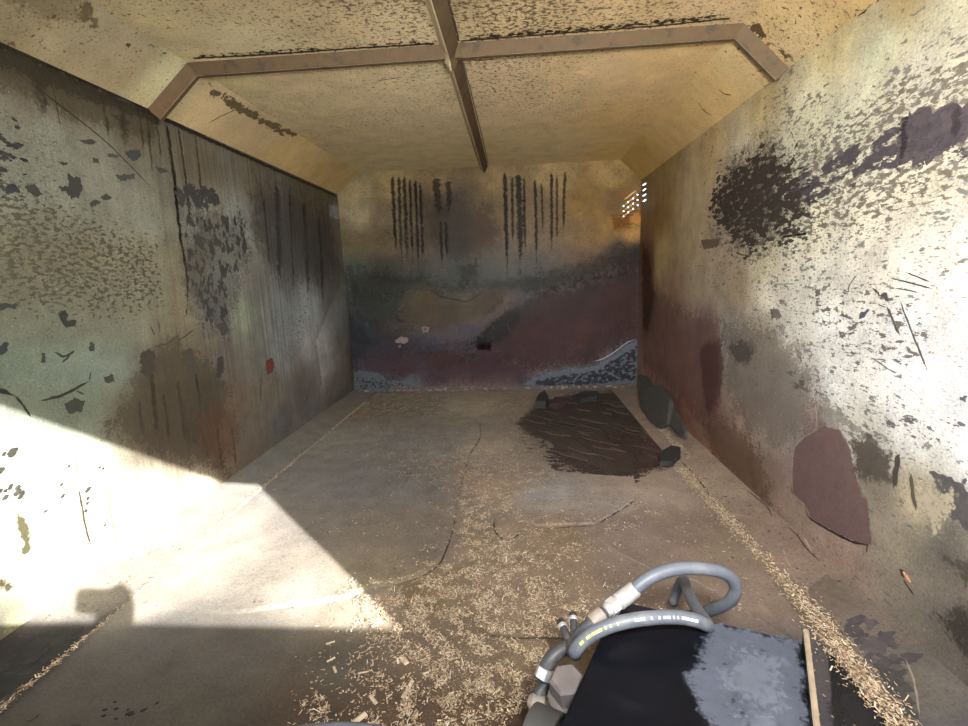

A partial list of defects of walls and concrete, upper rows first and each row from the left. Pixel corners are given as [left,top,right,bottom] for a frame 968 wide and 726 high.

peeling [706,38,968,263]
peeling [0,112,169,351]
damp [390,177,452,260]
damp [503,173,567,267]
crack [0,388,31,417]
peeling [41,350,76,363]
damp [353,339,673,477]
crack [396,437,481,585]
crack [548,501,633,529]
corrosion [791,427,871,552]